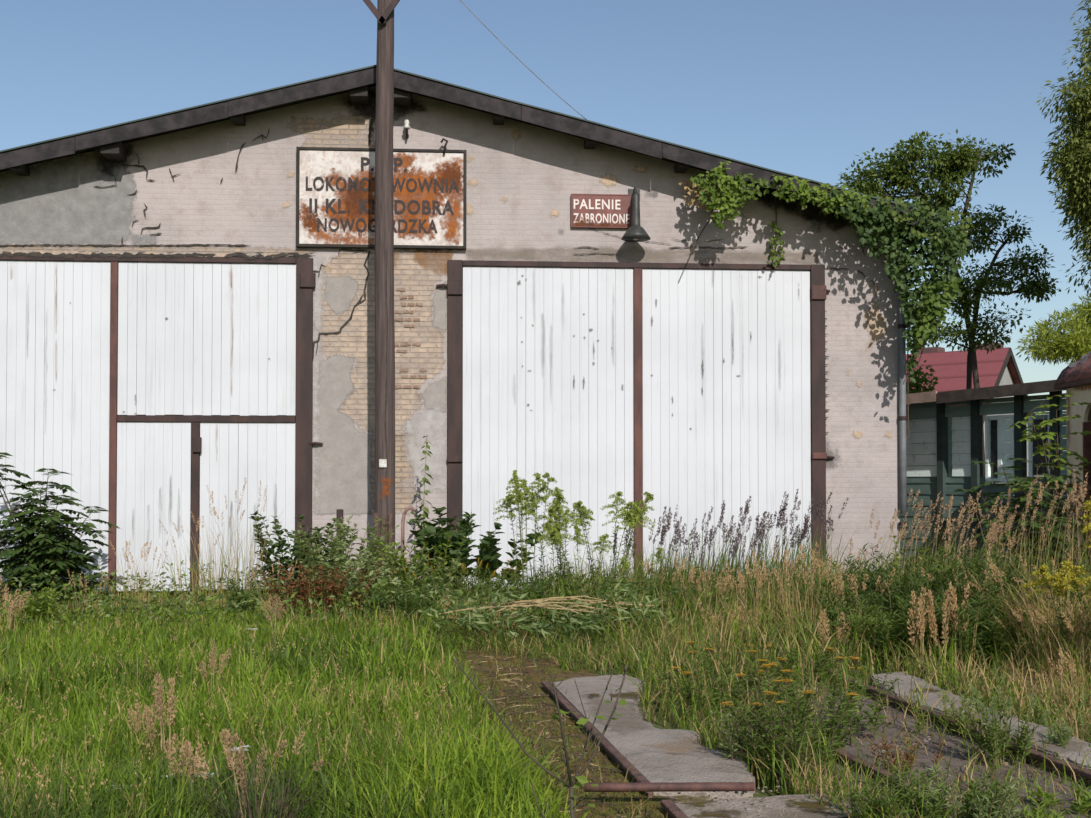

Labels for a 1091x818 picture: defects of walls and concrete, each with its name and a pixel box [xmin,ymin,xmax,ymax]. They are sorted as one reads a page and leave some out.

crack [0,154,249,247]
crack [220,130,269,184]
flaking render [314,251,375,509]
crack [313,249,388,530]
flaking render [394,249,452,515]